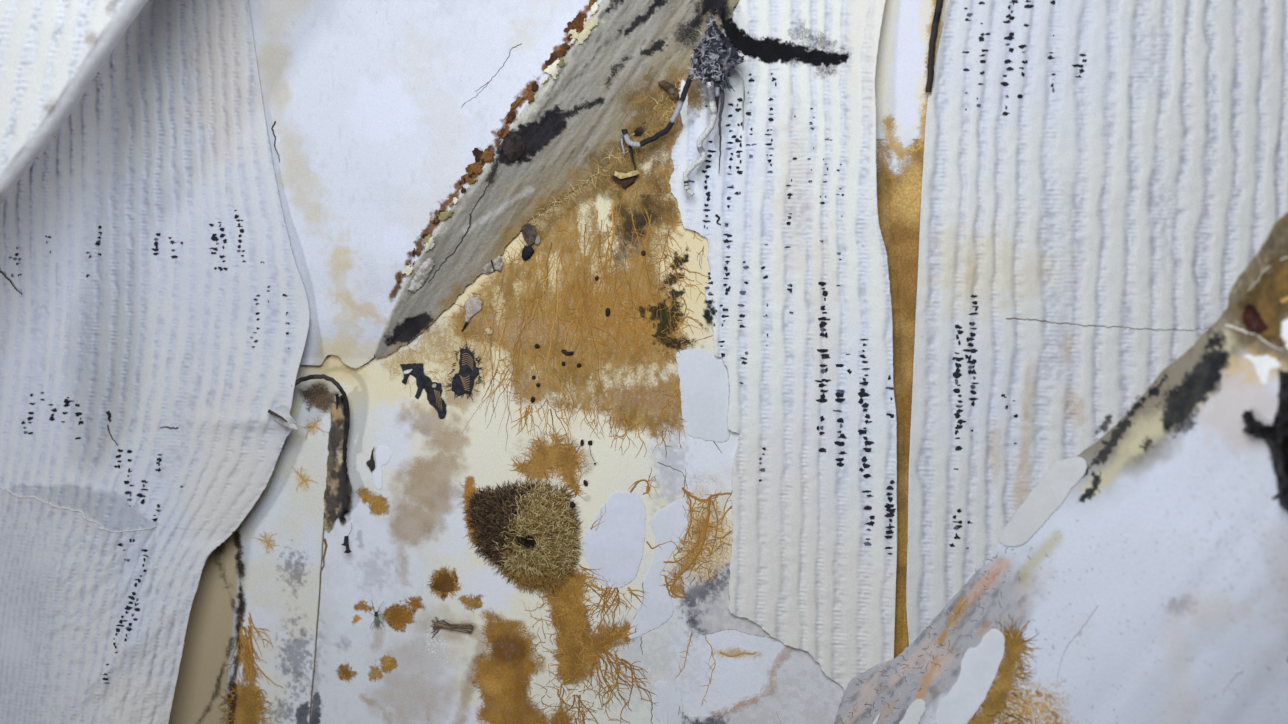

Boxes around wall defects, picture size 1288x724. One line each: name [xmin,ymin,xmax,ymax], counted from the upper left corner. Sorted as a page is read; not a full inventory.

rust [389,0,599,298]
peeling [400,296,483,419]
peeling [521,223,540,261]
damp [357,0,777,550]
peeling [676,348,730,443]
damp [814,0,1070,724]
damp [1080,331,1230,502]
damp [1241,370,1288,512]
peeling [1243,304,1288,386]
damp [352,470,732,724]
peeling [583,492,689,639]
peeling [899,628,1005,724]